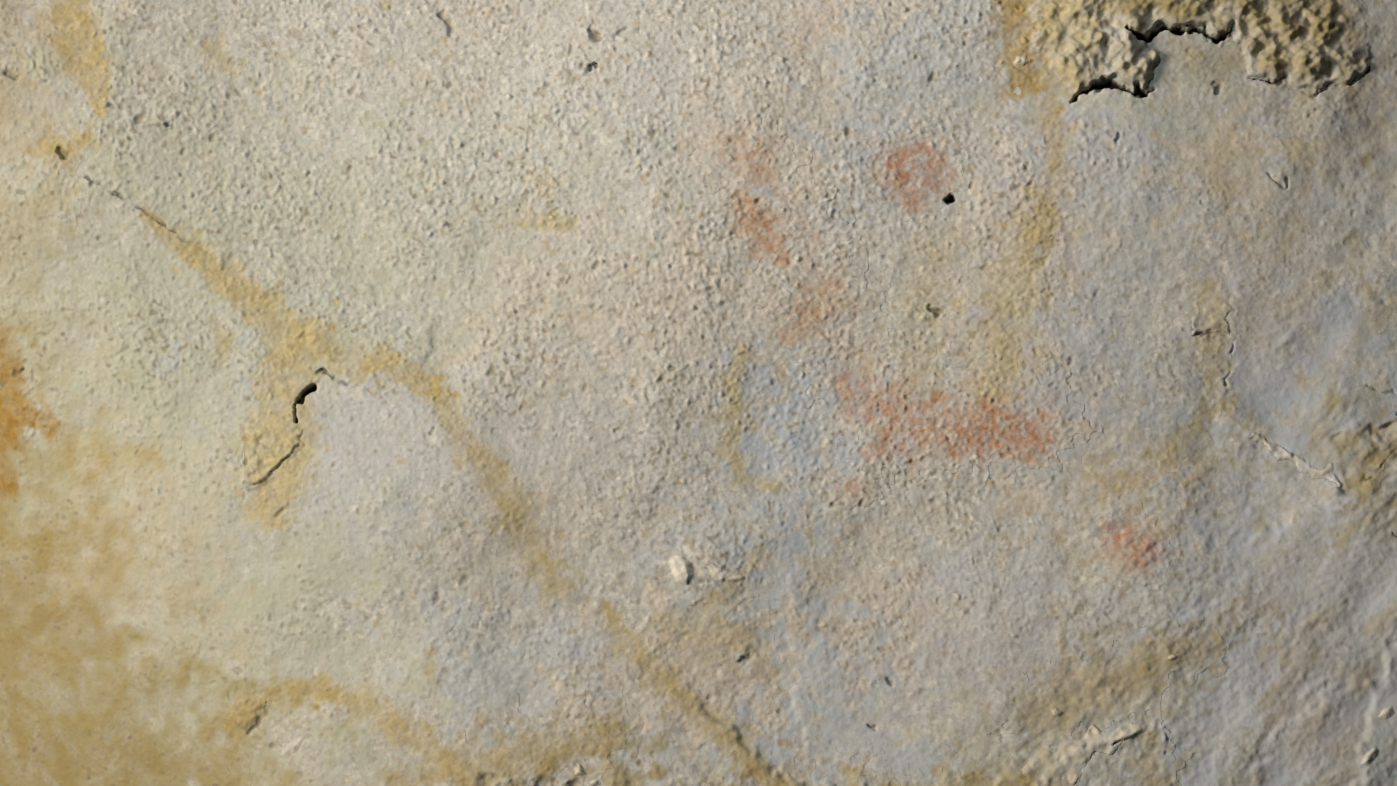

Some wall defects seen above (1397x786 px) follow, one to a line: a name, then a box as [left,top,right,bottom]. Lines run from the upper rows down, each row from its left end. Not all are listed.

peeling [1012,55,1028,69]
spalling [1211,80,1224,95]
water stain [502,147,582,245]
crack [293,366,359,423]
crack [240,424,249,469]
water stain [132,205,1242,786]
crack [530,778,583,786]